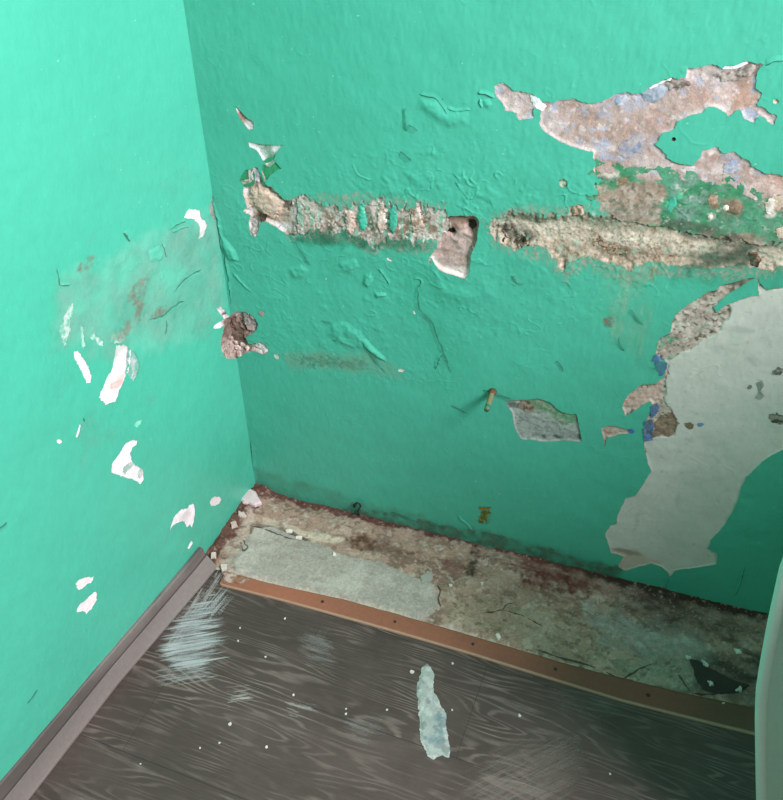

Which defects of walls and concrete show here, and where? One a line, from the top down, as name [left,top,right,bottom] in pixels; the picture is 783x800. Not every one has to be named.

peeling [59,303,139,405]
spalling [206,61,783,707]
peeling [111,440,144,484]
peeling [170,504,195,530]
corrosion [479,507,491,523]
leakage [466,531,504,576]
peeling [76,576,97,614]